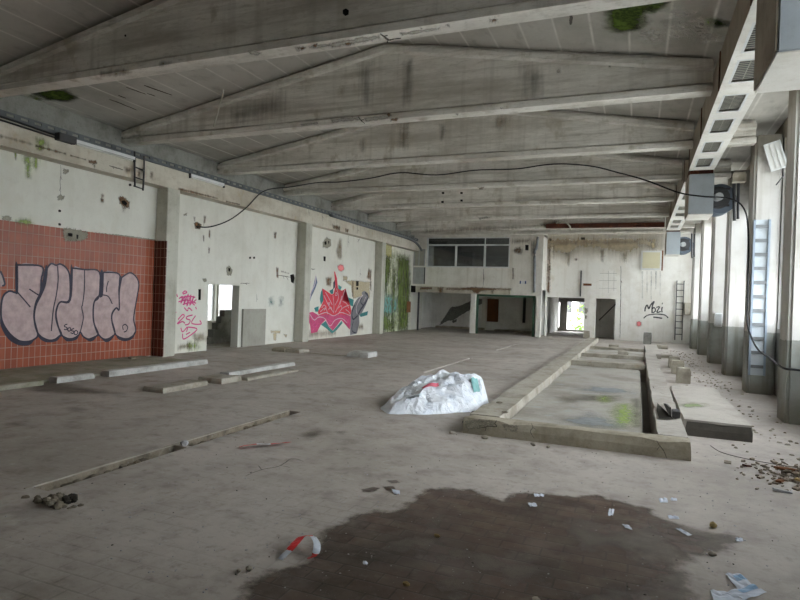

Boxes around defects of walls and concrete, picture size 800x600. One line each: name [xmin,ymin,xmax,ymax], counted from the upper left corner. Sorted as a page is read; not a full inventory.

damp [383,245,410,333]
damp [362,480,399,492]
damp [245,488,735,600]